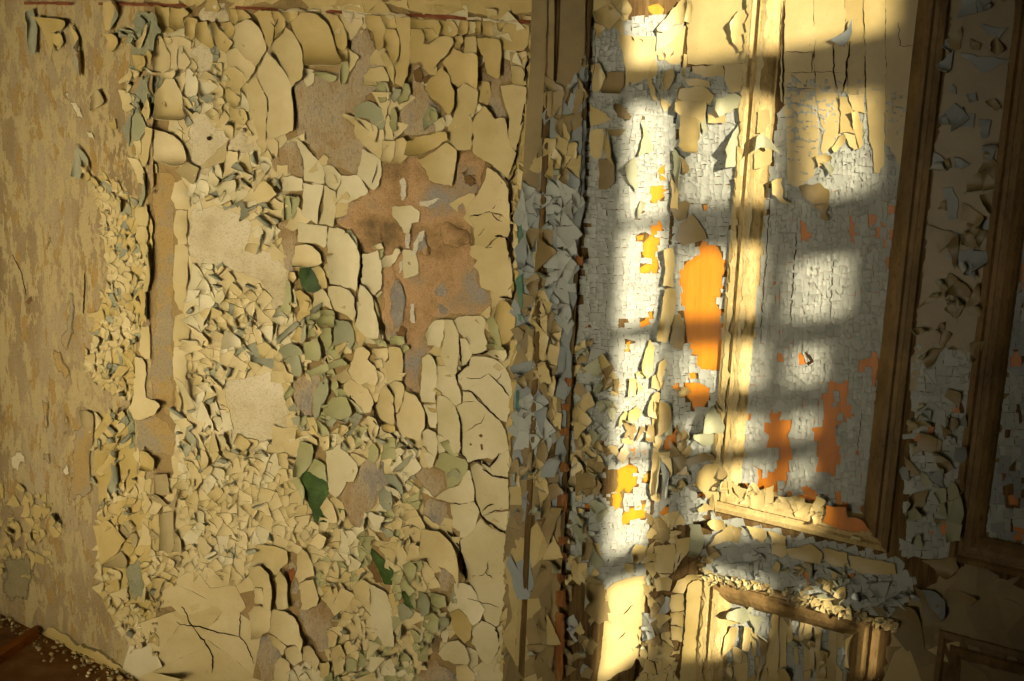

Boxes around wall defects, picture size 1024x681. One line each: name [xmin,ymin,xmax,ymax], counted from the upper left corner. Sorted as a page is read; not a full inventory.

peeling [24,9,81,78]
peeling [771,0,918,221]
peeling [909,0,1016,391]
flaking render [70,0,871,681]
crack [454,502,506,534]
crack [455,339,509,479]
peeling [899,389,967,548]
crack [177,607,253,670]
peeling [746,526,1024,681]